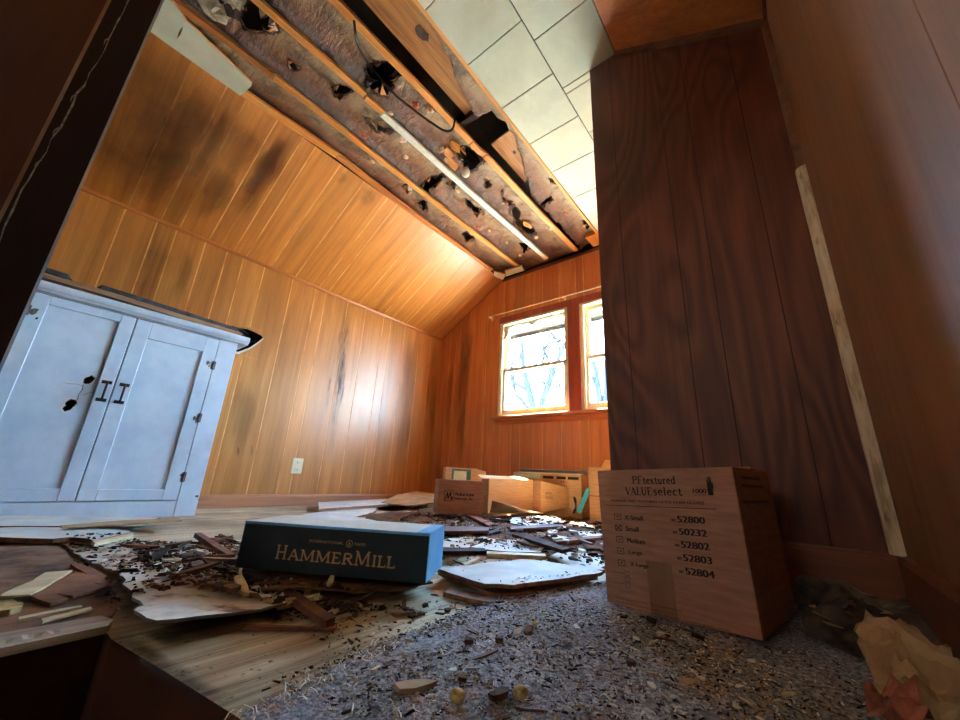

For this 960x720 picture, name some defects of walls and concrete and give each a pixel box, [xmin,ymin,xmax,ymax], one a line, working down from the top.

leakage [253,148,281,191]